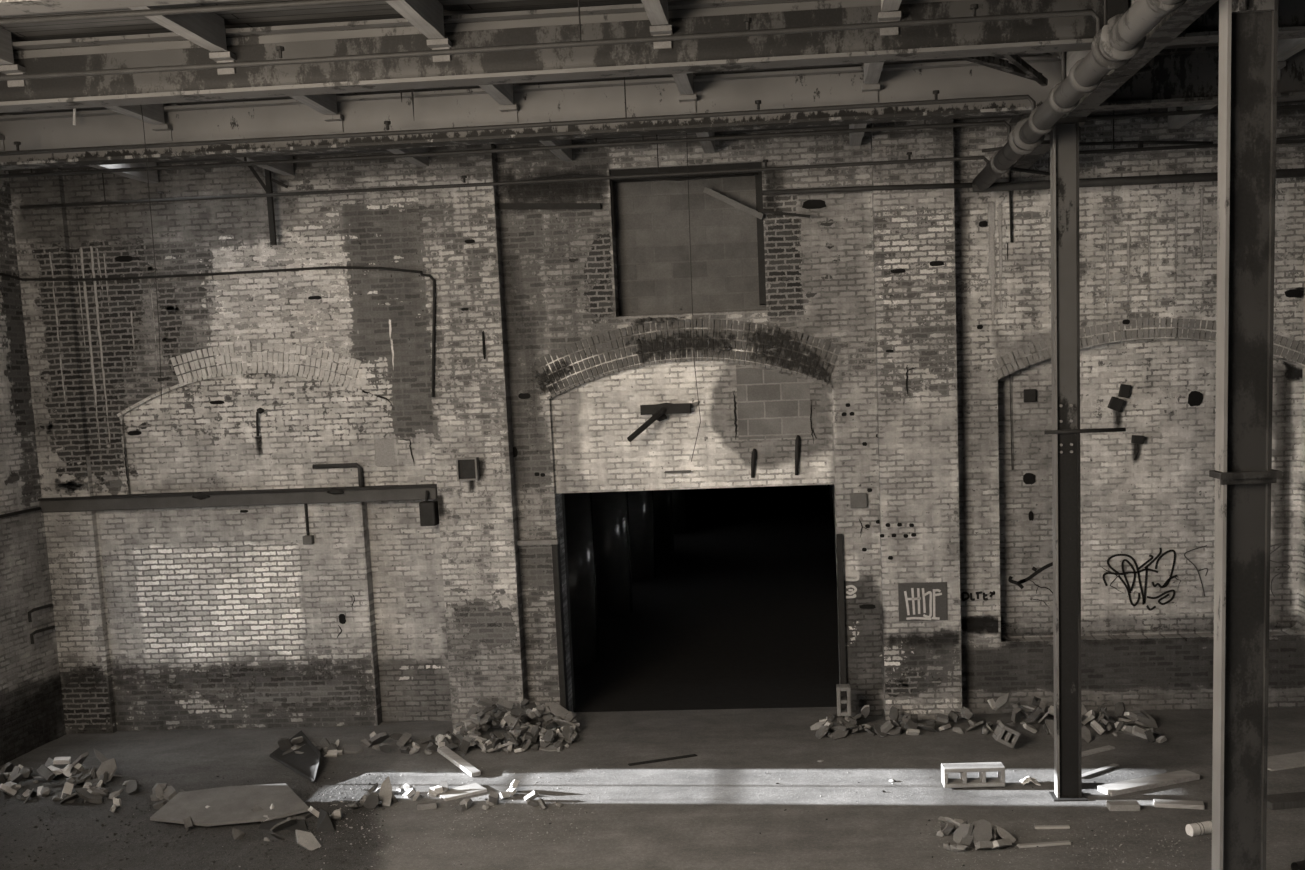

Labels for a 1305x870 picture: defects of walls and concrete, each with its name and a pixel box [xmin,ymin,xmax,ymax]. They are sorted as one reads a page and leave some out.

peeling [0,237,182,496]
peeling [196,198,402,379]
peeling [367,193,416,213]